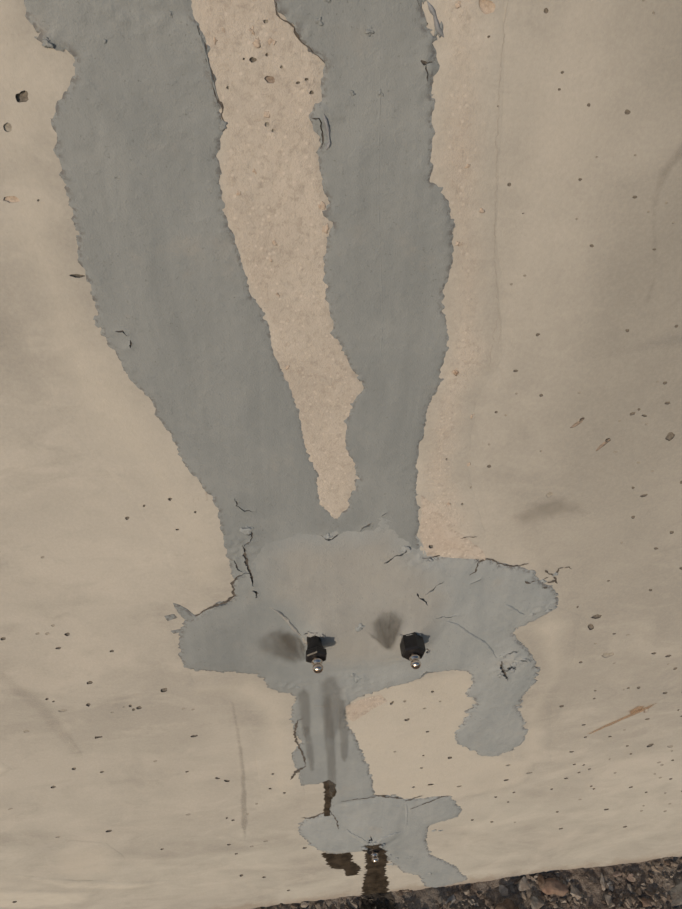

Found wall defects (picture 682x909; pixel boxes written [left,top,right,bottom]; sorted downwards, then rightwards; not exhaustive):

spalling [191,0,364,519]
spalling [416,0,504,557]
spalling [0,0,305,804]
crack [196,532,257,616]
crack [461,537,570,589]
damp [323,780,336,816]
damp [321,844,397,909]